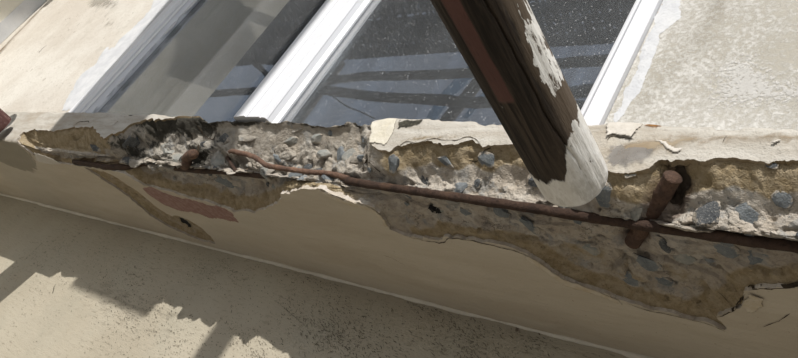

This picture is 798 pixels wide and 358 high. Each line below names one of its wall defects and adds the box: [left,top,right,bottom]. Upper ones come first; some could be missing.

peeling [709,54,798,113]
corrosion [72,159,147,170]
corrosion [173,166,265,179]
spalling [19,117,798,325]
corrosion [343,170,798,254]
crack [632,281,798,330]